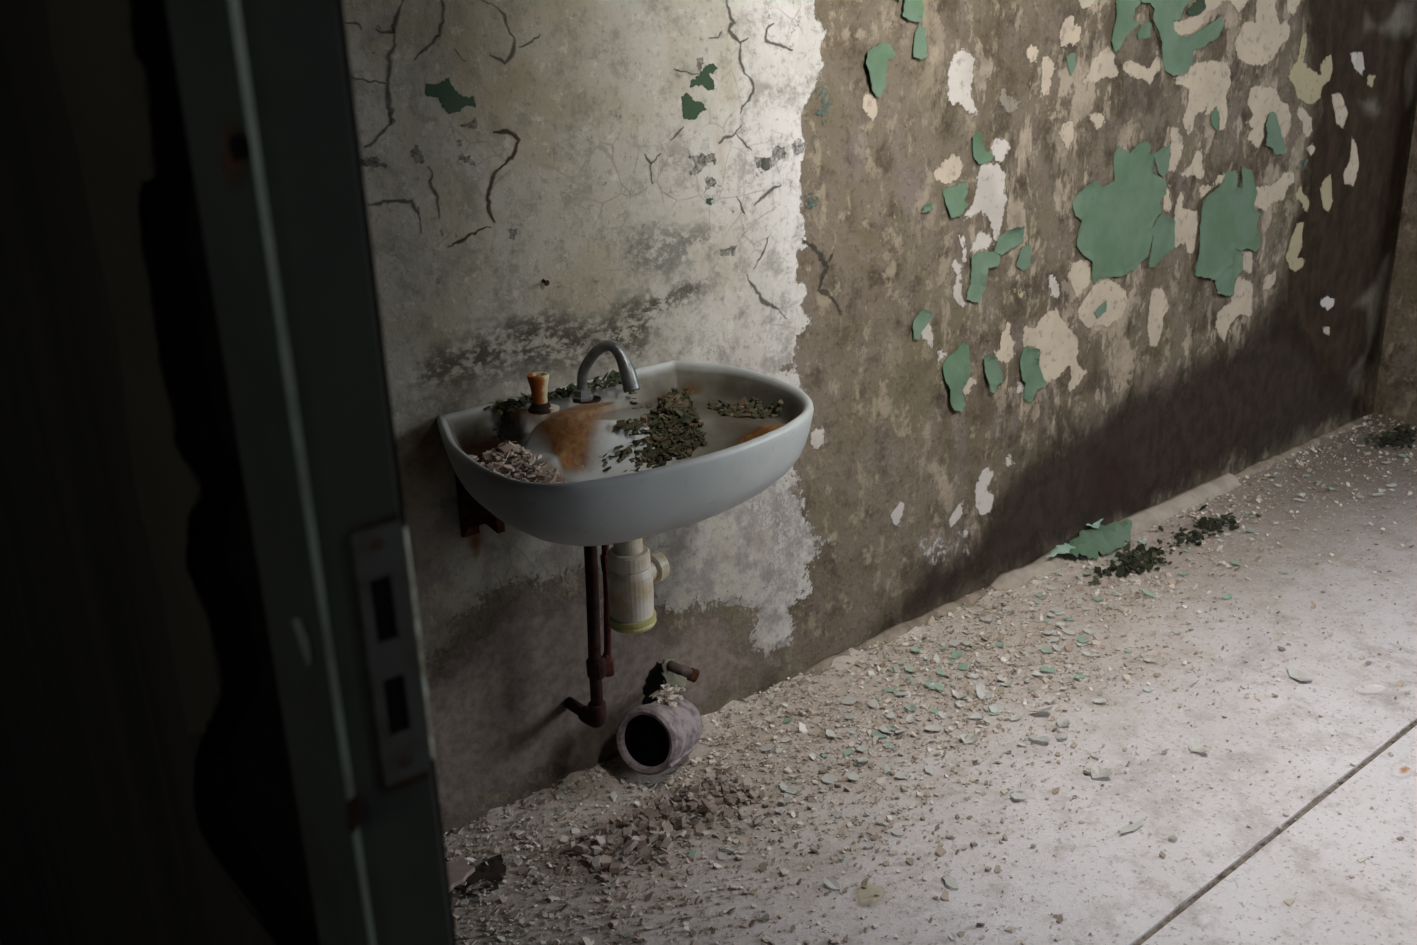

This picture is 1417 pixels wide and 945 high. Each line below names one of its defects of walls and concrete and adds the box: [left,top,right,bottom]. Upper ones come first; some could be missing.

crack [345,0,541,148]
crack [711,0,793,151]
peeling [862,42,896,122]
peeling [900,0,927,60]
peeling [1350,51,1376,87]
crack [368,129,521,248]
crack [645,126,684,184]
peeling [912,0,1359,412]
crack [736,184,842,319]
peeling [891,502,904,528]
peeling [947,454,1015,538]